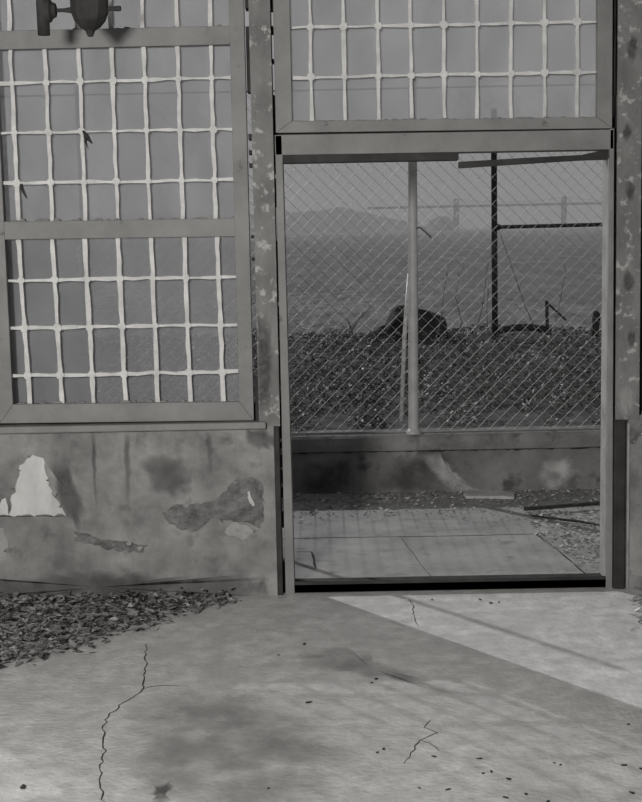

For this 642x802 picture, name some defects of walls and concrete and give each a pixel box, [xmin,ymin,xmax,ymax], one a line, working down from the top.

flaking render [0,454,66,517]
crack [99,645,179,802]